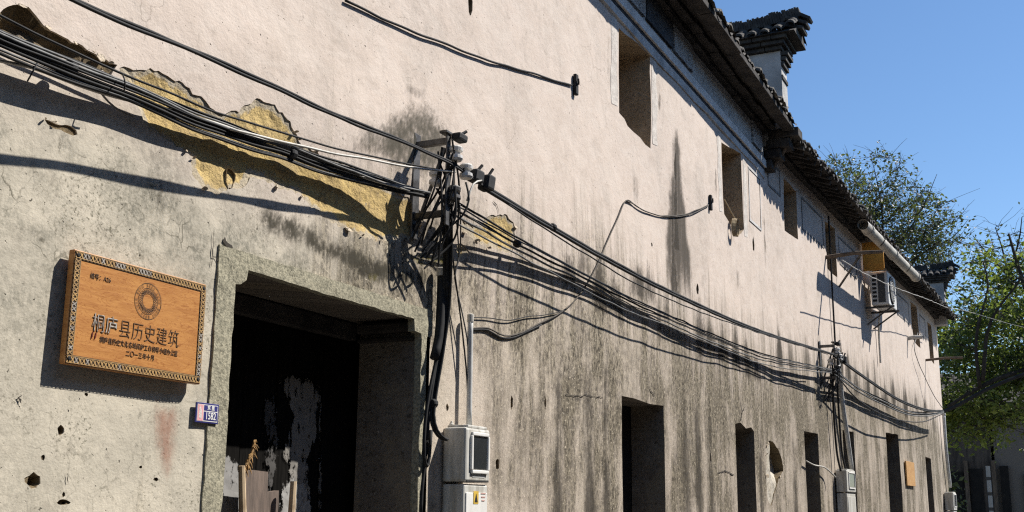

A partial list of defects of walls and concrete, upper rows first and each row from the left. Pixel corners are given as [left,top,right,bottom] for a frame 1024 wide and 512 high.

spalling [0,3,424,243]
spalling [456,214,517,261]
leakage [667,136,690,293]
leakage [564,254,623,321]
spalling [24,472,41,489]
leakage [586,441,609,512]
leakage [684,410,714,512]